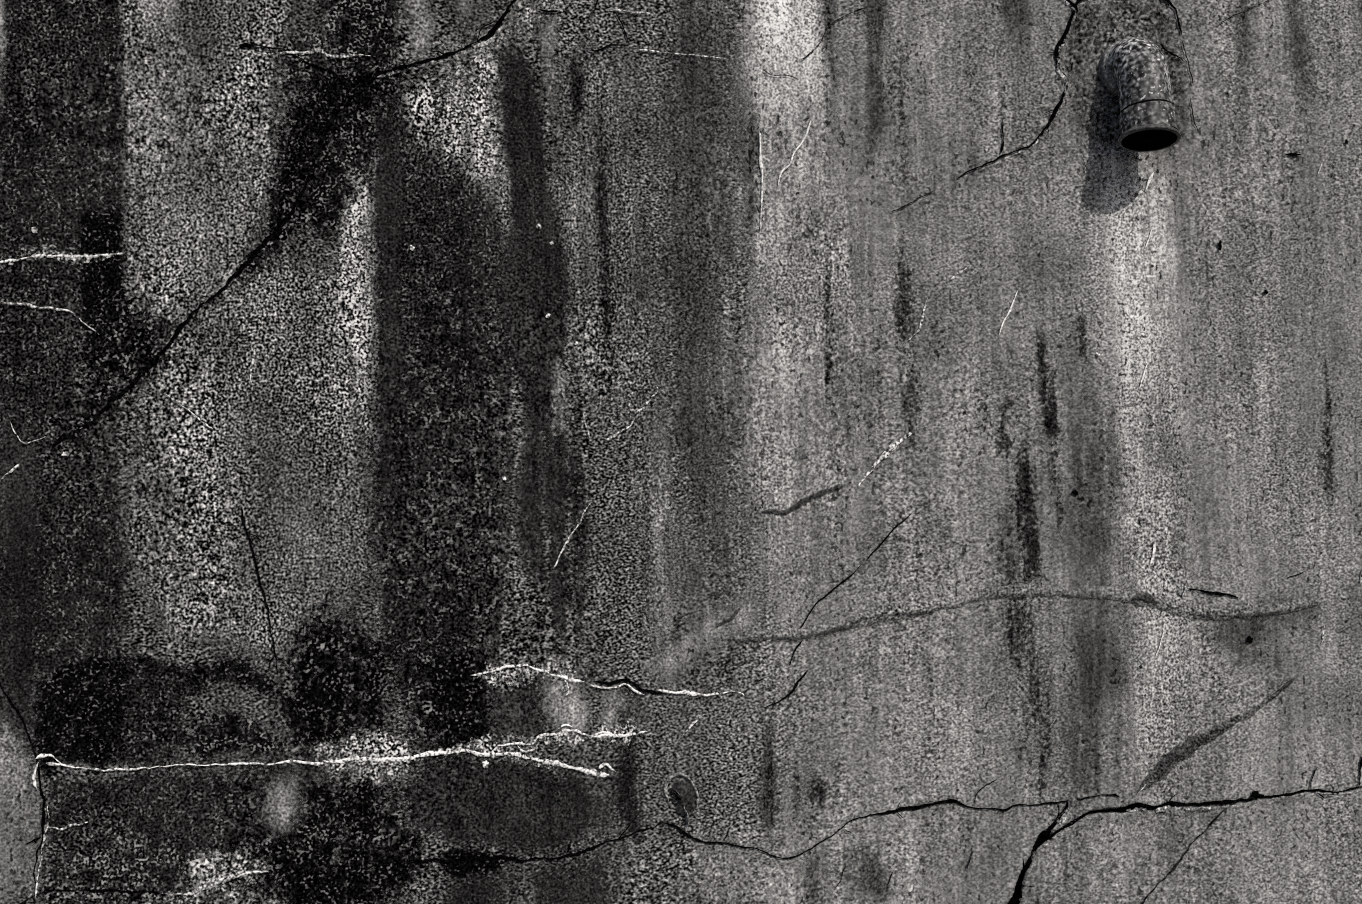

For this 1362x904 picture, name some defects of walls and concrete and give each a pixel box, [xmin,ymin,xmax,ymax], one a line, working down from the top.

leakage [866,0,910,197]
crack [891,0,1082,212]
crack [1157,0,1199,133]
crack [51,0,560,446]
leakage [0,0,869,904]
crack [593,679,665,695]
crack [763,513,912,708]
leakage [995,330,1078,803]
leakage [1069,164,1196,844]
crack [1188,588,1238,598]
leakage [847,849,886,902]
crack [411,757,1362,904]